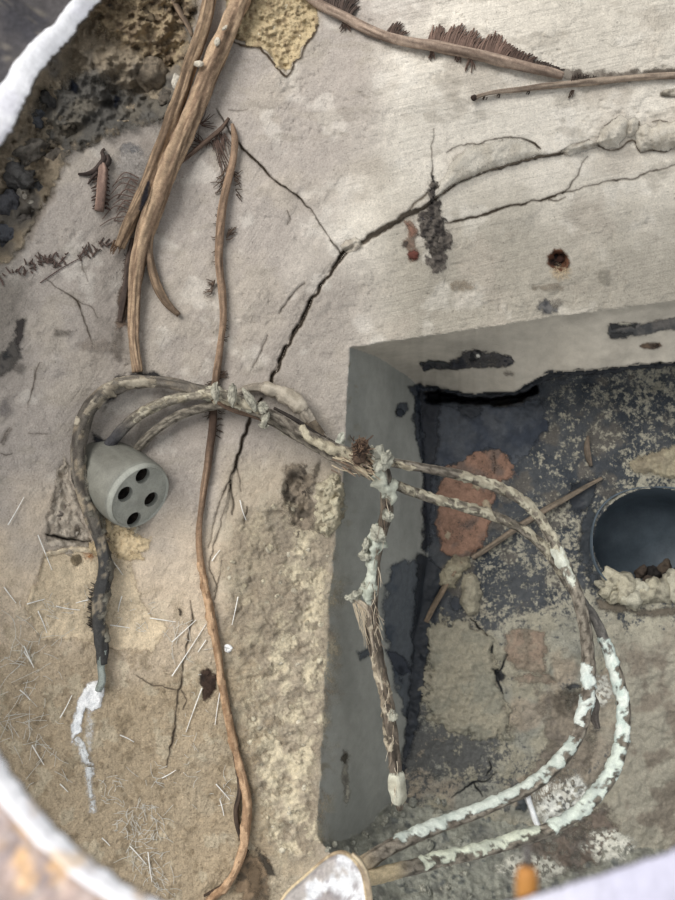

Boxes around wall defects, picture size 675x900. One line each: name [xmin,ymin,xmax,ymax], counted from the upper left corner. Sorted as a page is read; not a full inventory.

rust [402,220,419,261]
damp [417,175,453,273]
rust [547,249,570,278]
crack [209,115,670,599]
crack [139,600,194,768]
damp [71,710,95,813]